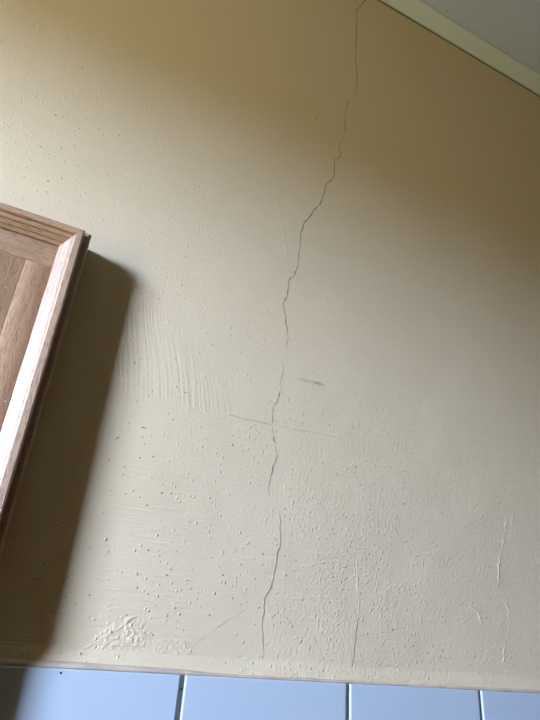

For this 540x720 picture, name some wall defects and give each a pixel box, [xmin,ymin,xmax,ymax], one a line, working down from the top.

crack [232,0,540,495]
crack [262,512,281,660]
crack [351,556,359,668]